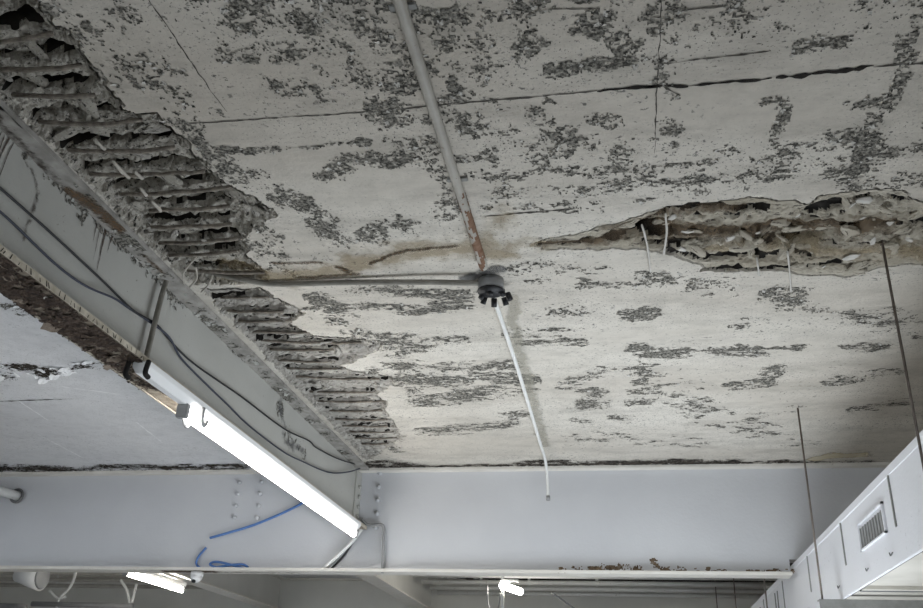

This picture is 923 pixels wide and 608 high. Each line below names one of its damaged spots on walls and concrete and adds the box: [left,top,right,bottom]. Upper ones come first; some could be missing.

crack [149,0,364,125]
crack [397,1,923,154]
spalling [185,0,923,353]
spalling [0,0,542,465]
rust [455,193,485,271]
damp [459,266,507,280]
damp [545,222,626,246]
damp [638,204,895,240]
peeling [555,342,821,448]
peeling [819,368,904,387]
peeling [845,398,915,412]
rust [559,558,727,571]